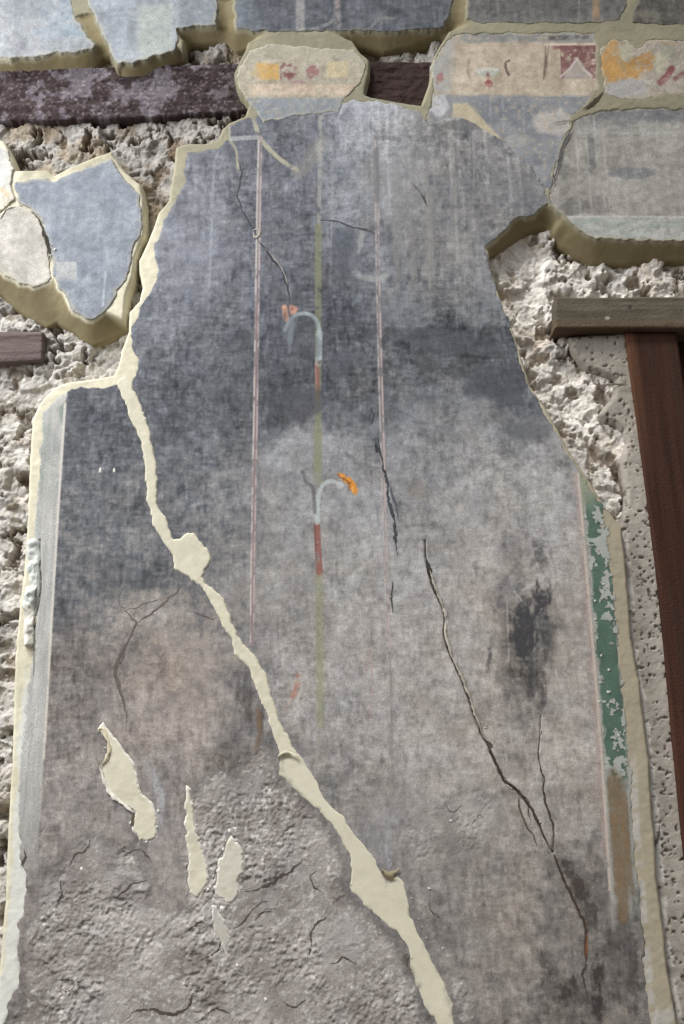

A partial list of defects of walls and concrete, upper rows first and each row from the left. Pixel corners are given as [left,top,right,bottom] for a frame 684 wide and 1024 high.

crack [236,161,290,300]
crack [113,377,454,1024]
crack [425,542,588,999]
leakage [509,580,551,692]
peeling [583,498,618,658]
peeling [597,669,628,784]
spalling [7,722,424,1024]
spalling [414,887,473,1024]